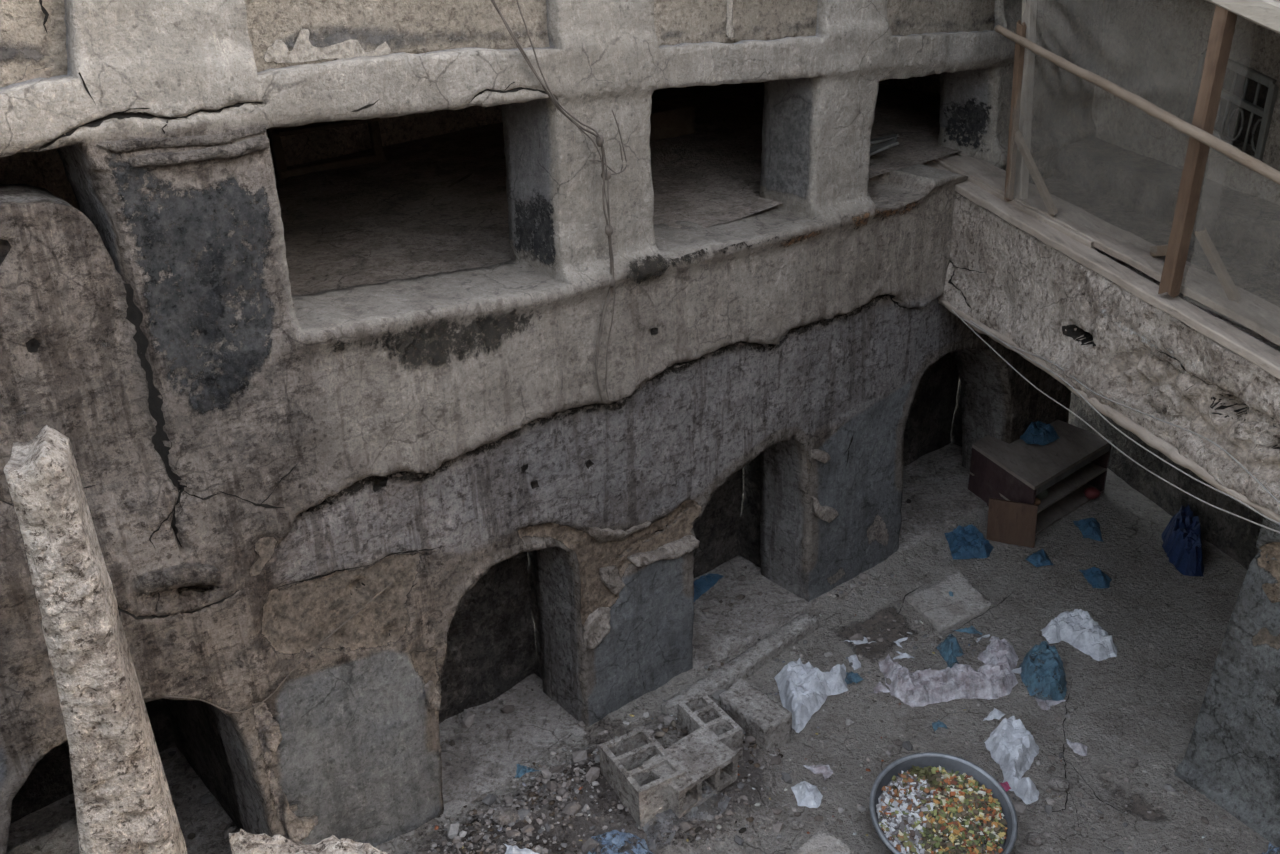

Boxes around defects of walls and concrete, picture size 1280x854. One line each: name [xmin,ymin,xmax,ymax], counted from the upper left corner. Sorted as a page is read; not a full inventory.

crack [351,100,378,112]
crack [469,82,547,103]
water stain [334,307,541,369]
crack [667,293,914,369]
crack [124,283,299,551]
flaking render [518,500,702,649]